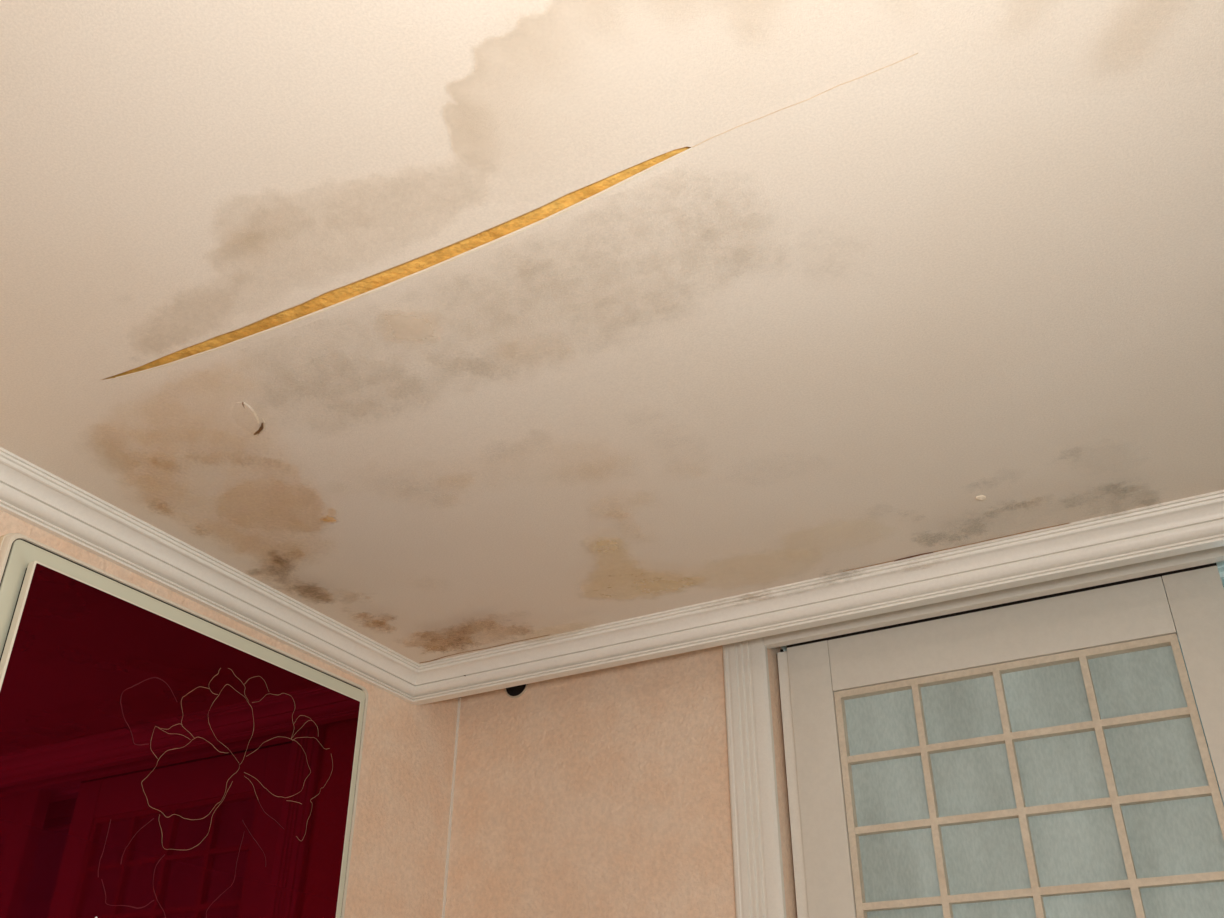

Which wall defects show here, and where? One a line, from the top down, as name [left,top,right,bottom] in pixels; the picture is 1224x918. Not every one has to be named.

crack [692,53,918,148]